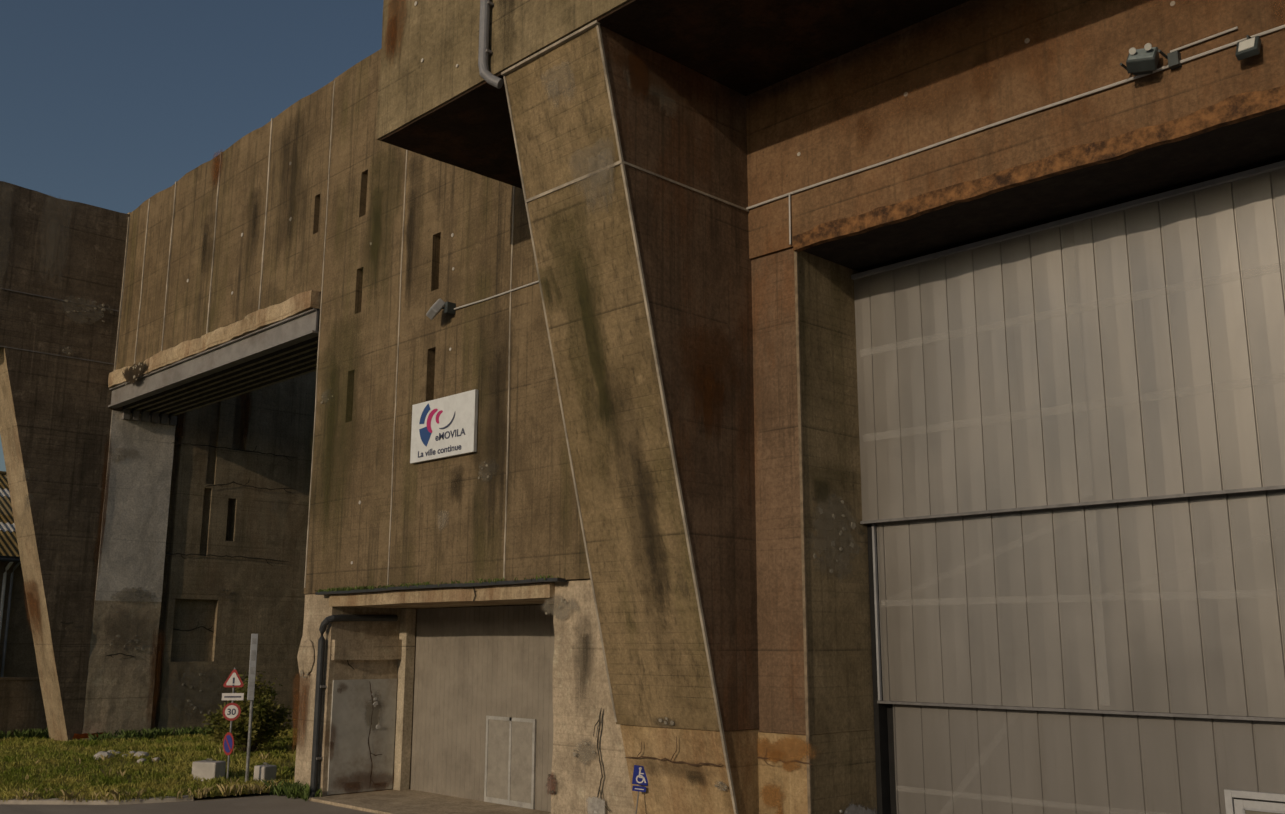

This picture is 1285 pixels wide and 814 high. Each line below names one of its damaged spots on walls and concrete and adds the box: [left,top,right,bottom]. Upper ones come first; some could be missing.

corrosion [793,85,1285,252]
crack [347,660,382,789]
crack [593,707,721,812]